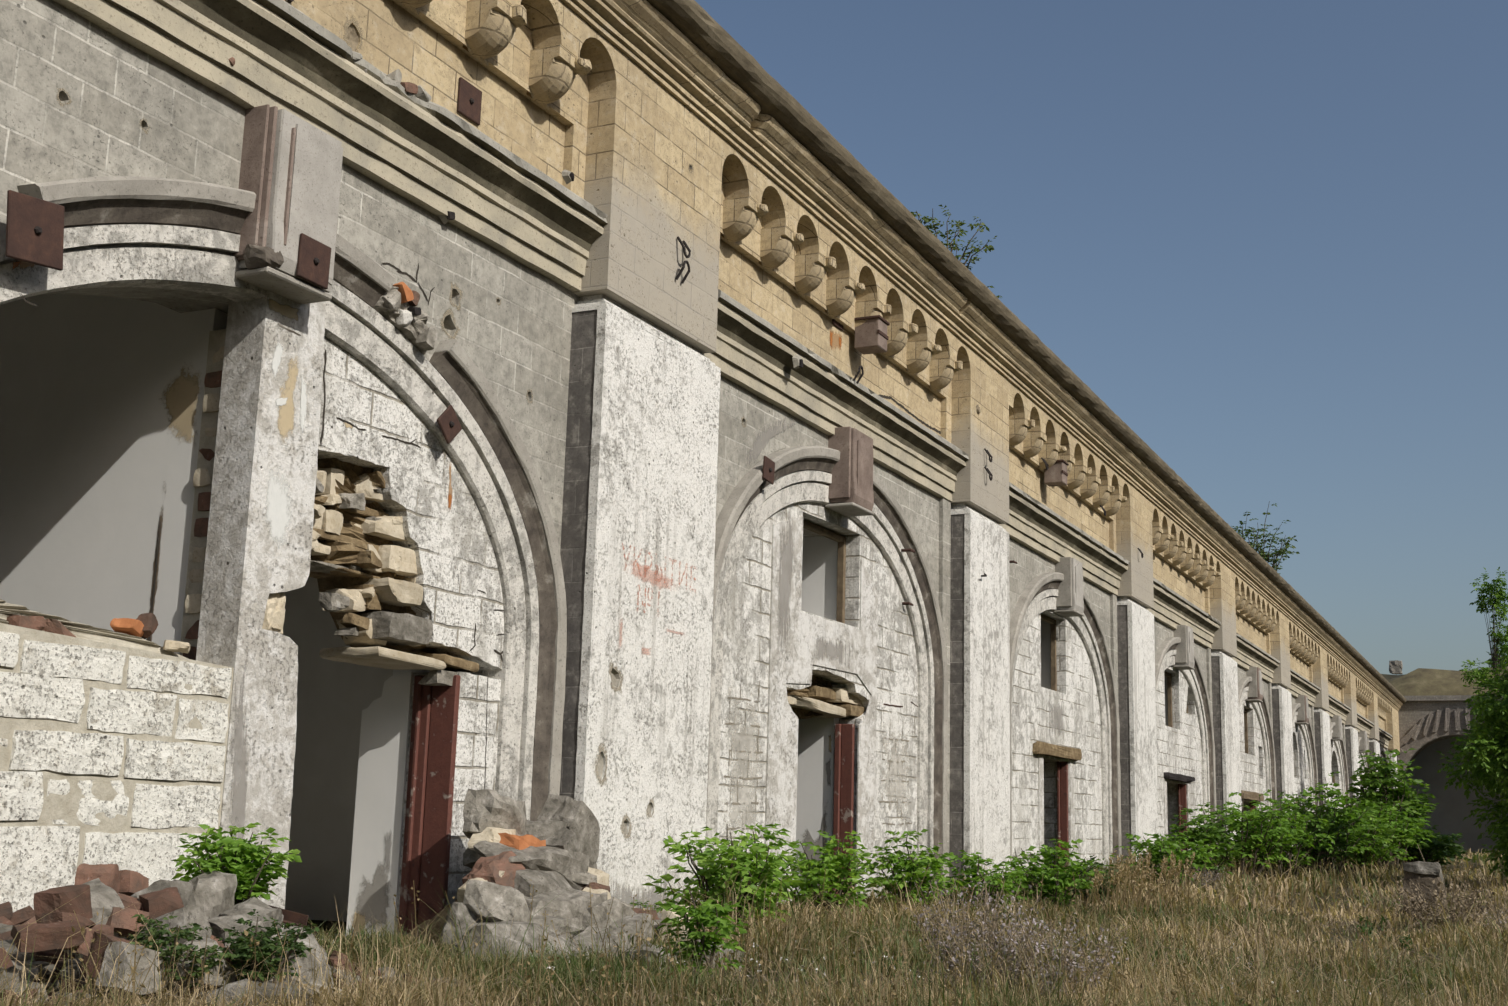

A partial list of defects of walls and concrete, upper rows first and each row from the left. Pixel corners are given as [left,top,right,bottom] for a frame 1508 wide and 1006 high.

peeling [272,343,307,437]
flaking render [310,468,433,647]